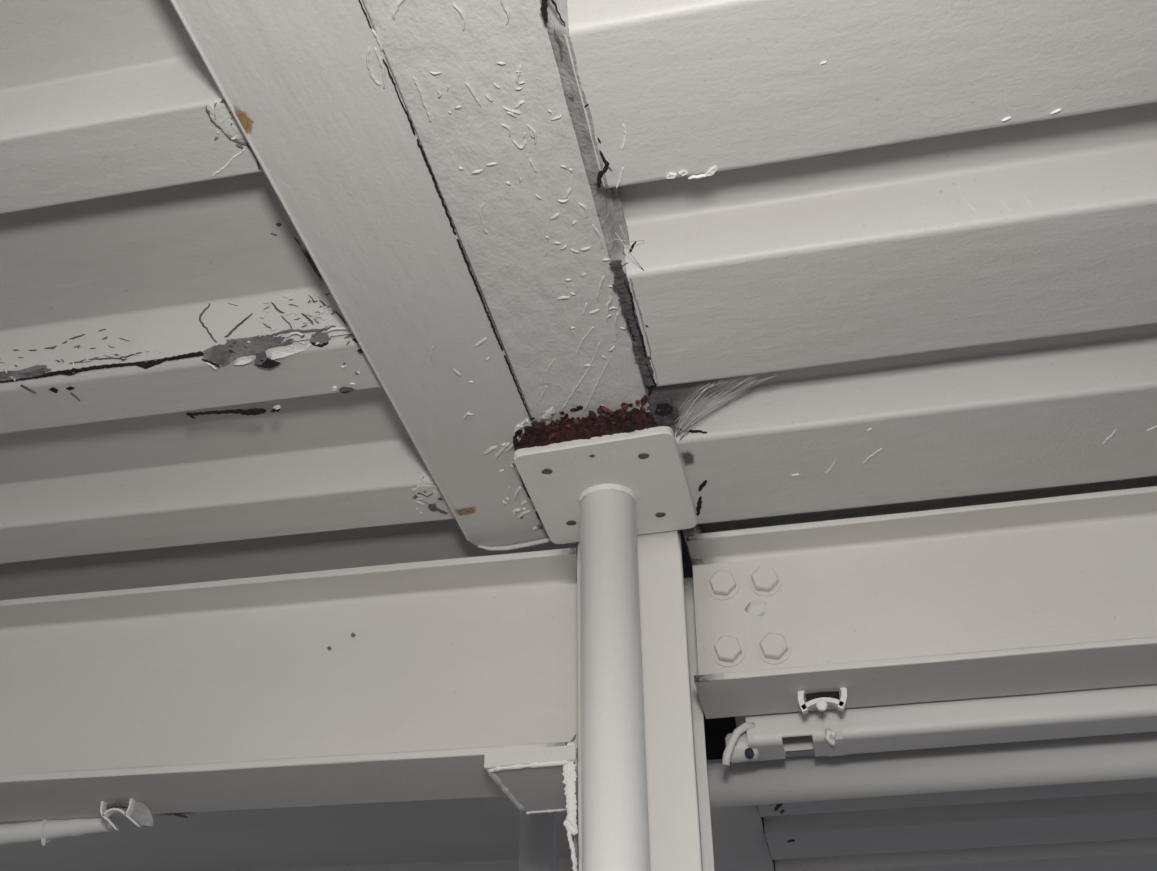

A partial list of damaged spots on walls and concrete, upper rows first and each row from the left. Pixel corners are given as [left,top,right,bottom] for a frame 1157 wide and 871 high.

rust [235,110,253,134]
peeling [201,325,363,370]
peeling [0,365,80,401]
spalling [332,363,360,394]
rust [513,395,656,451]